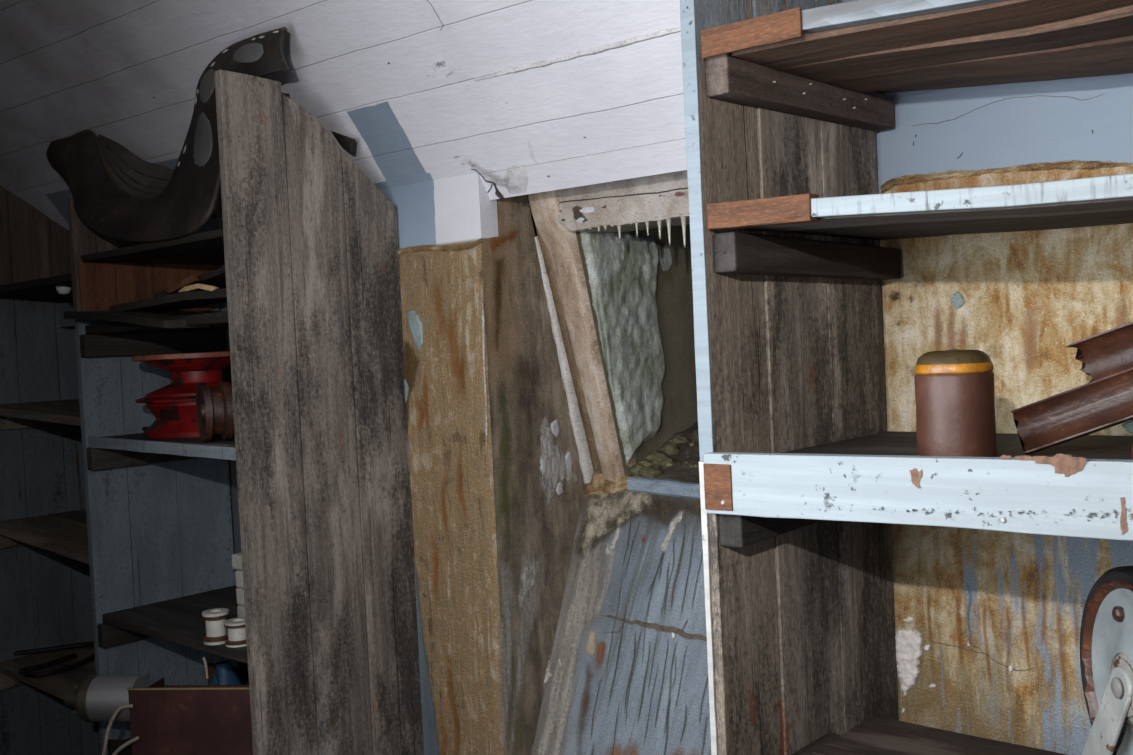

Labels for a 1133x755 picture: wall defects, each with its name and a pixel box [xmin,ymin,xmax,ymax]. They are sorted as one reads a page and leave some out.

water stain [880,160,1133,194]
water stain [880,223,1133,436]
water stain [539,231,708,755]
crack [603,615,707,641]
water stain [891,499,1133,755]